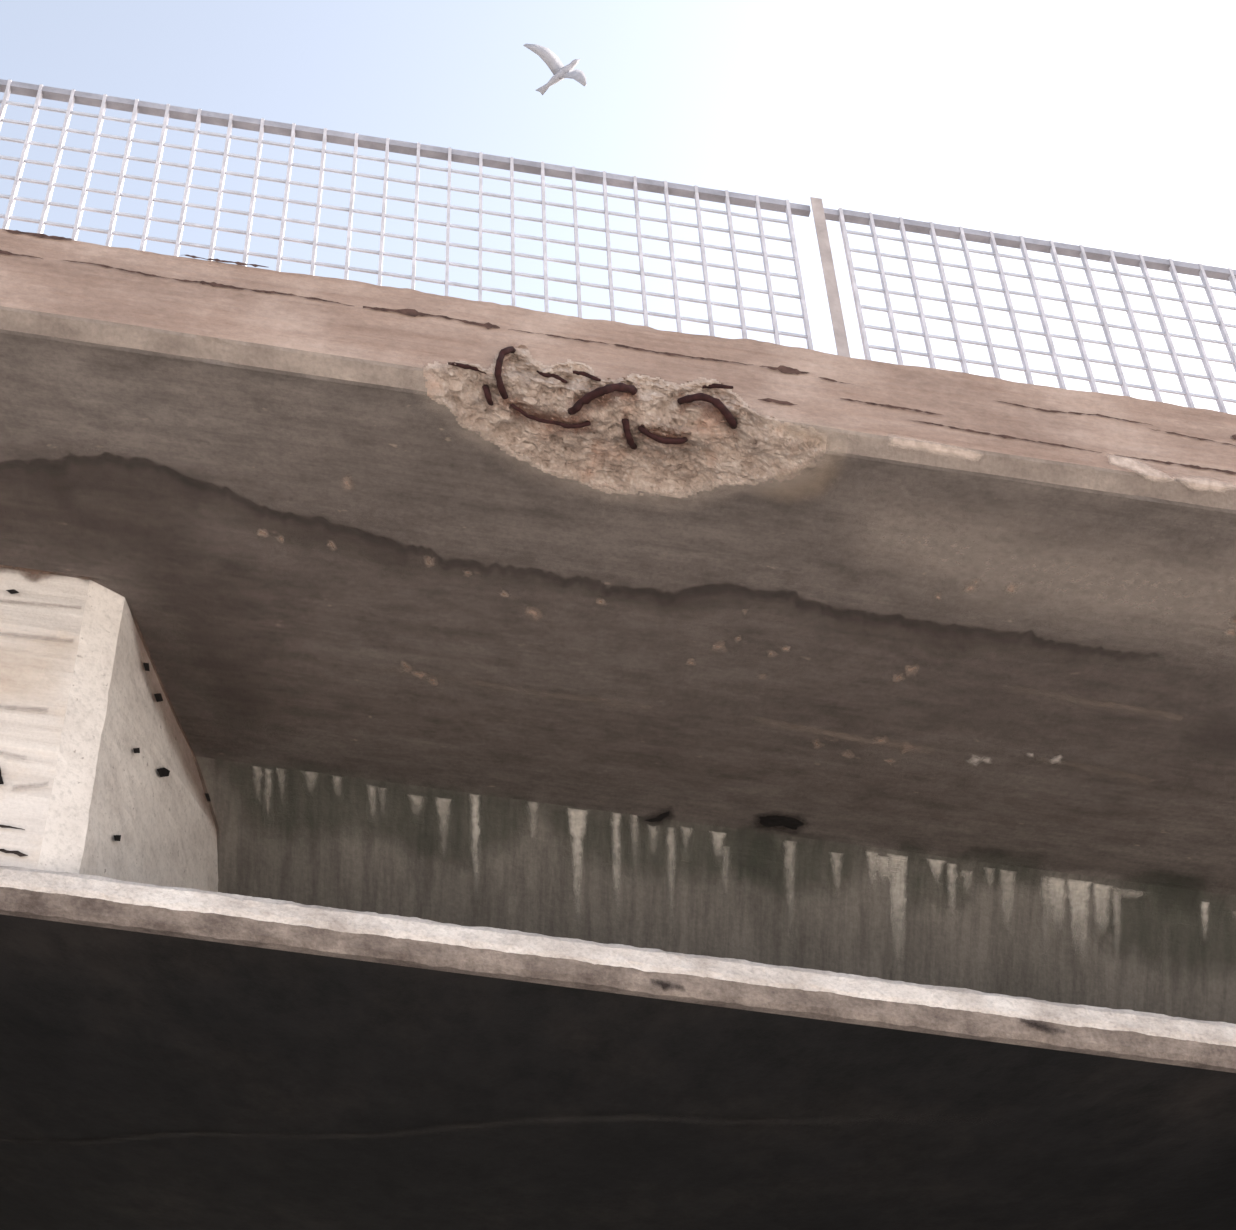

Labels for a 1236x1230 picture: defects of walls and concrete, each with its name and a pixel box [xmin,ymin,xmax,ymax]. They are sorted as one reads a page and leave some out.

spalling [423,346,827,498]
leakage [252,766,284,796]
leakage [437,798,451,829]
leakage [470,794,479,859]
leakage [568,808,587,878]
leakage [612,813,691,888]
leakage [711,831,728,876]
leakage [784,840,795,879]
leakage [867,852,907,917]
leakage [928,859,970,892]
leakage [985,867,1014,909]
leakage [1041,876,1141,924]